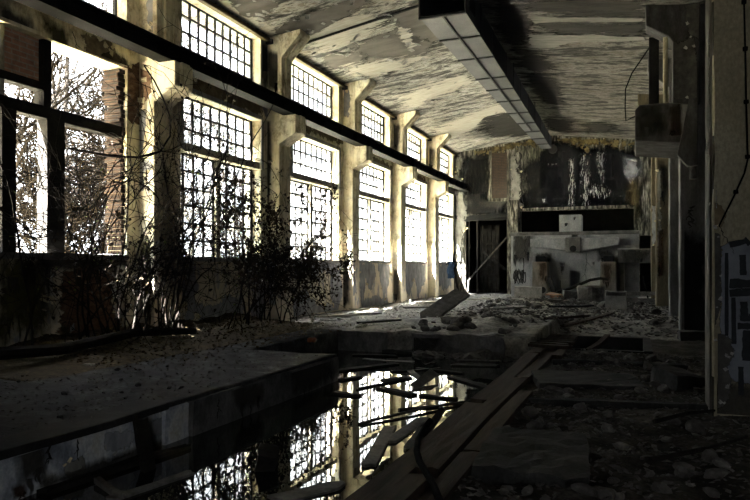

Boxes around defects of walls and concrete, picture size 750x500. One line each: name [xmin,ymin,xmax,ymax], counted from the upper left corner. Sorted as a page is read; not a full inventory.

peeling [213,0,283,37]
peeling [303,8,435,81]
peeling [389,73,476,108]
peeling [306,125,343,145]
peeling [432,103,507,139]